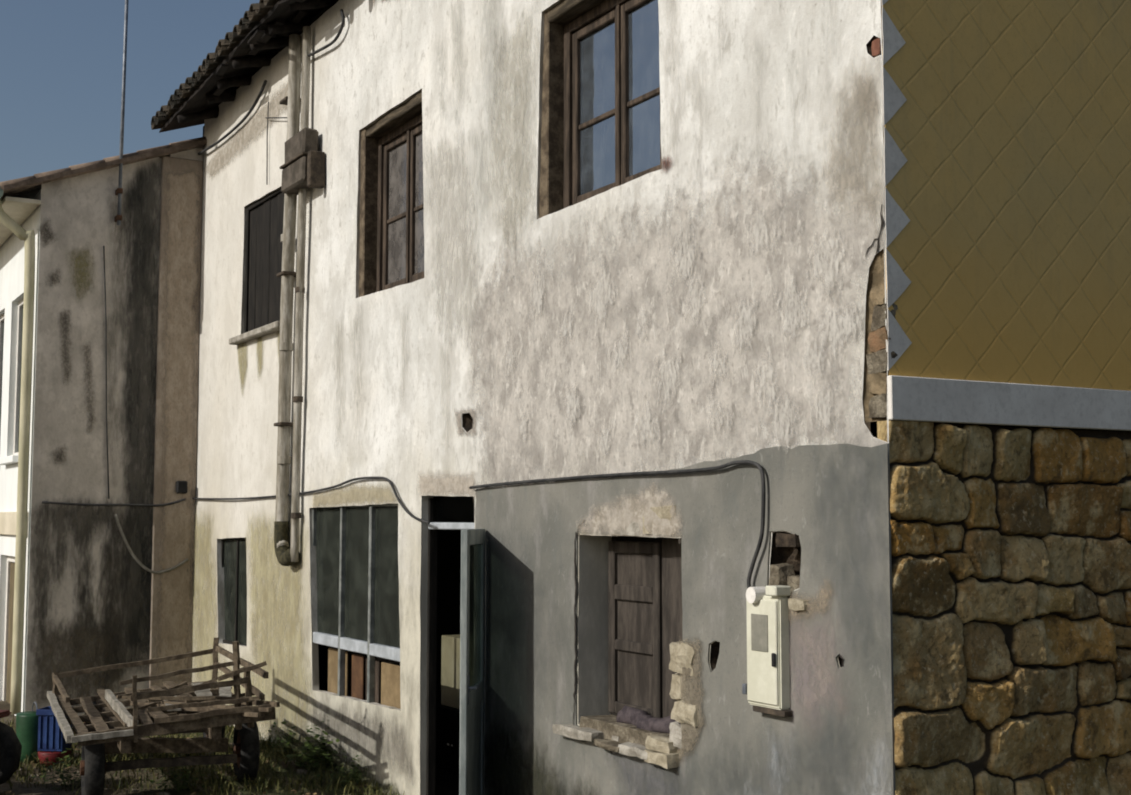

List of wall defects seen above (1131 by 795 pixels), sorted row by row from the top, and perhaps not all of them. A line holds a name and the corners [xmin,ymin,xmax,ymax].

spalling [867,36,883,58]
peeling [419,158,898,496]
leakage [34,162,161,706]
spalling [580,486,681,538]
spalling [768,532,830,617]